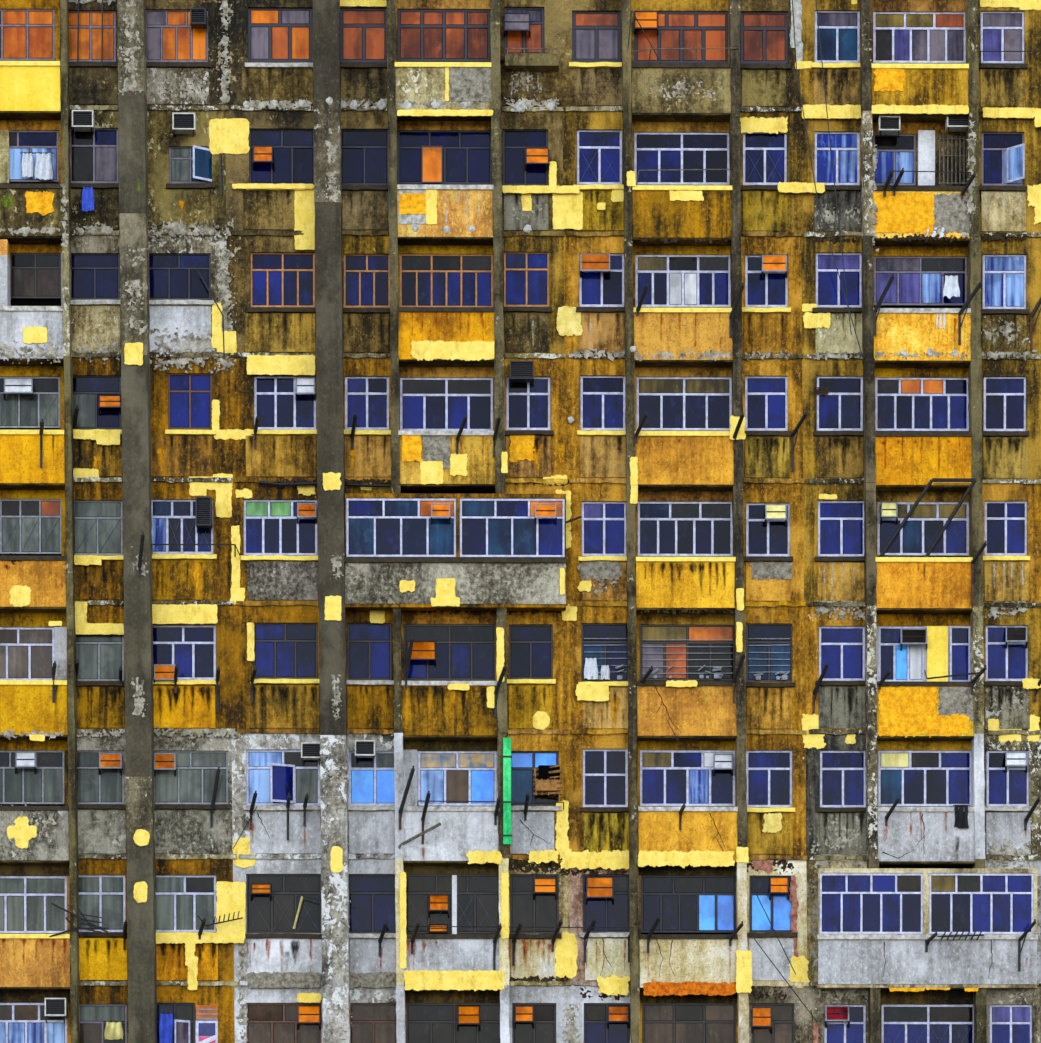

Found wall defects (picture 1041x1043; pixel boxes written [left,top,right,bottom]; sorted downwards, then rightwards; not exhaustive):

peeling [68,0,234,104]
peeling [248,97,313,110]
peeling [341,67,492,111]
peeling [504,71,559,112]
peeling [642,74,725,104]
damp [749,438,785,460]
peeling [577,561,623,599]
peeling [323,764,349,848]
peeling [236,883,569,1043]
peeling [562,987,625,1043]